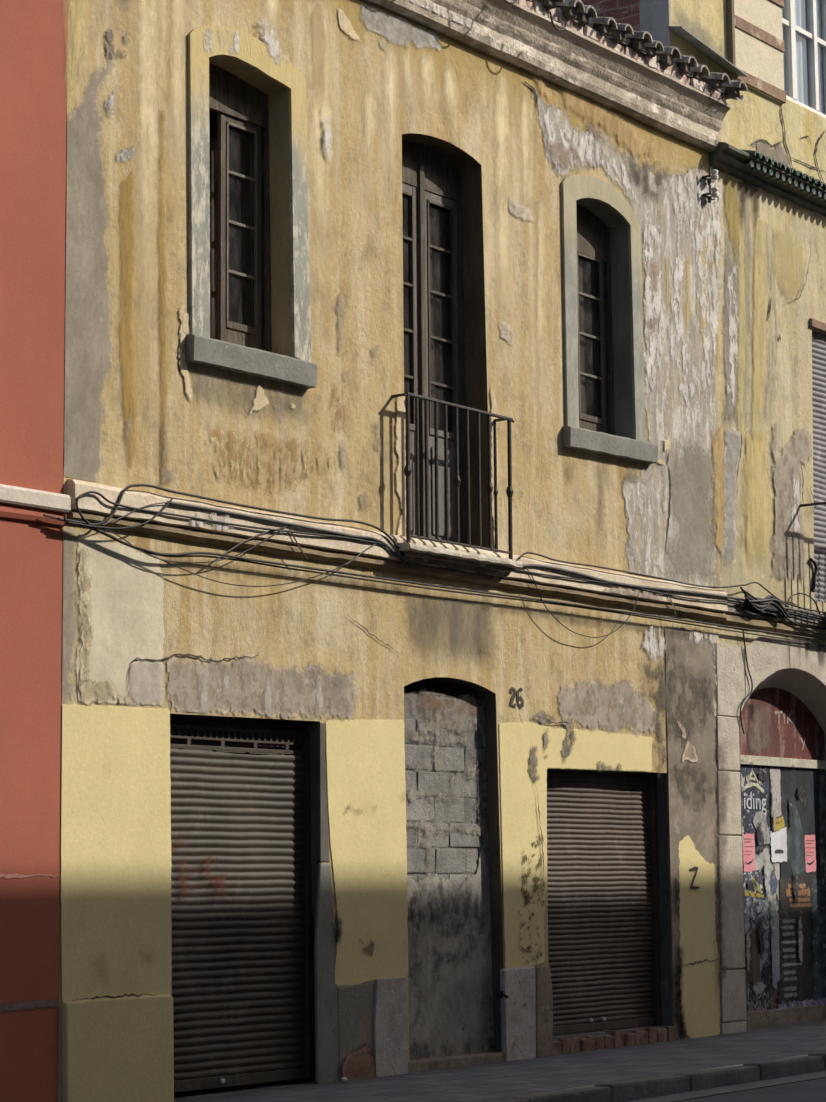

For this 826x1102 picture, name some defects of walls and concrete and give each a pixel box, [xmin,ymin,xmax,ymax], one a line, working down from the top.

peeling [338,6,441,51]
crack [751,108,826,182]
peeling [64,30,129,482]
peeling [532,92,742,586]
peeling [772,423,812,582]
peeling [62,530,357,721]
flaking render [605,586,662,600]
water stain [642,625,729,854]
crack [0,872,61,880]
peeling [520,836,545,962]
flaking render [529,625,720,1040]
flaking render [341,1045,377,1081]